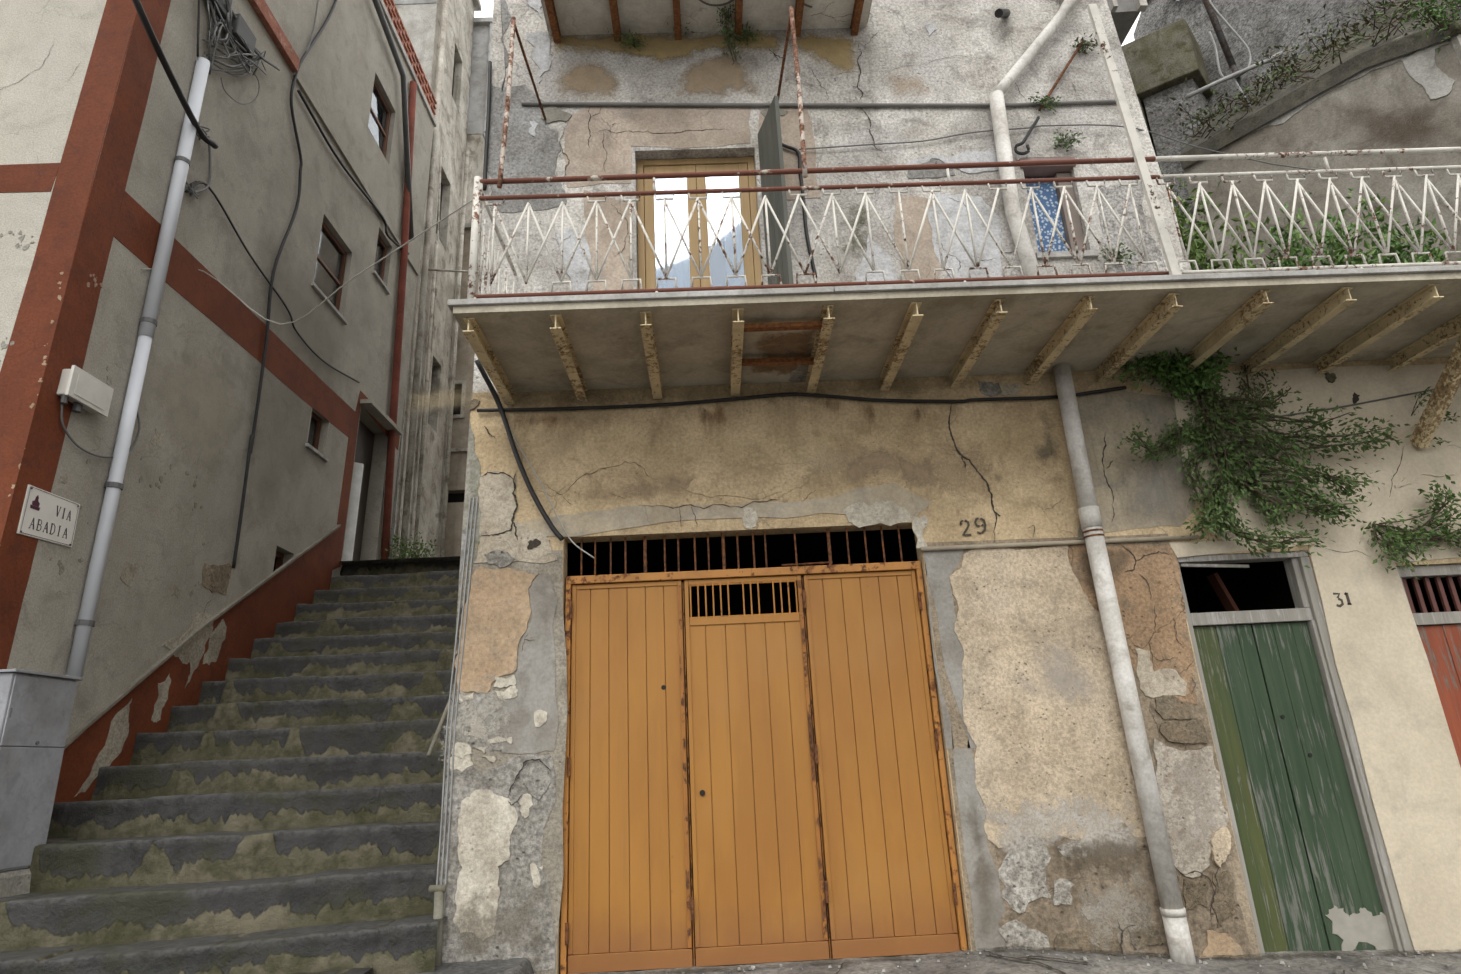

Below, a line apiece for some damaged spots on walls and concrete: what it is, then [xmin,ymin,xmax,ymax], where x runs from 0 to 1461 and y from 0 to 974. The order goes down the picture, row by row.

peeling [484,0,821,291]
leakage [557,33,777,95]
leakage [796,35,854,70]
peeling [1216,40,1455,151]
crack [481,426,816,540]
crack [948,404,1064,542]
peeling [151,542,233,723]
peeling [438,393,1170,972]
peeling [1078,391,1252,958]
peeling [75,699,132,796]
peeling [1325,906,1395,951]